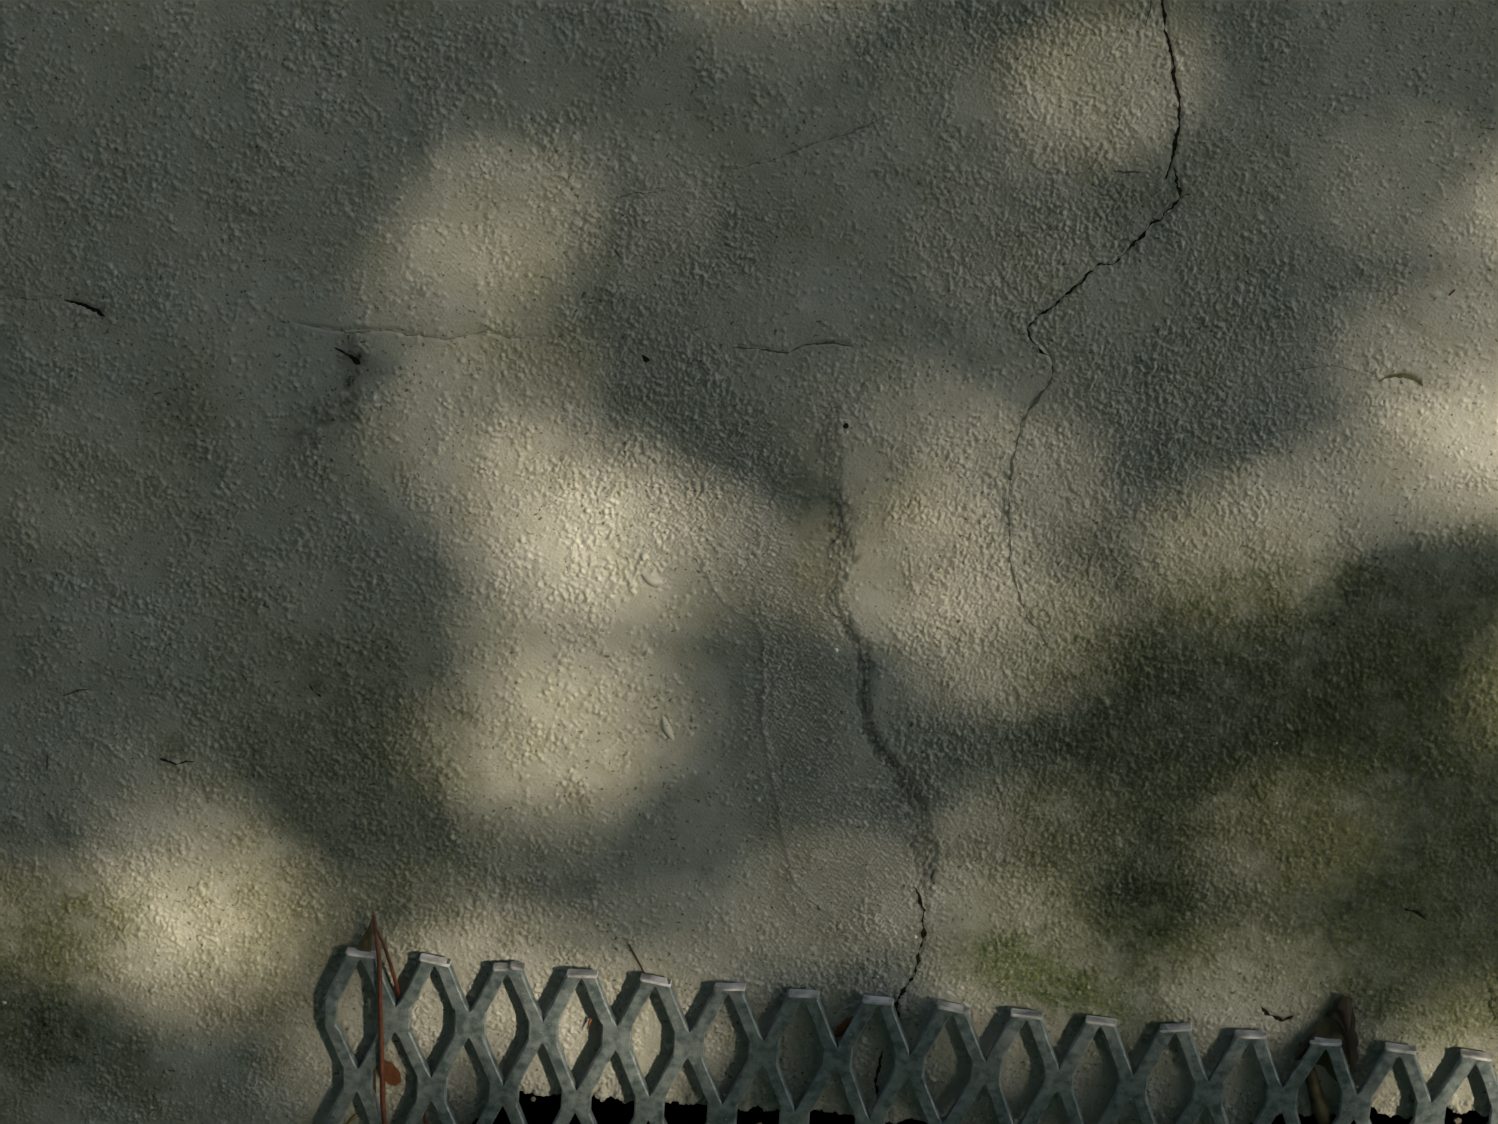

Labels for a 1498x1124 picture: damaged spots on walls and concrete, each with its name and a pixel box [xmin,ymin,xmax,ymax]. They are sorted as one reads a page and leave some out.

crack [293,321,547,341]
crack [999,0,1189,648]
crack [732,341,880,397]
crack [821,419,939,1017]
crack [874,1052,883,1096]